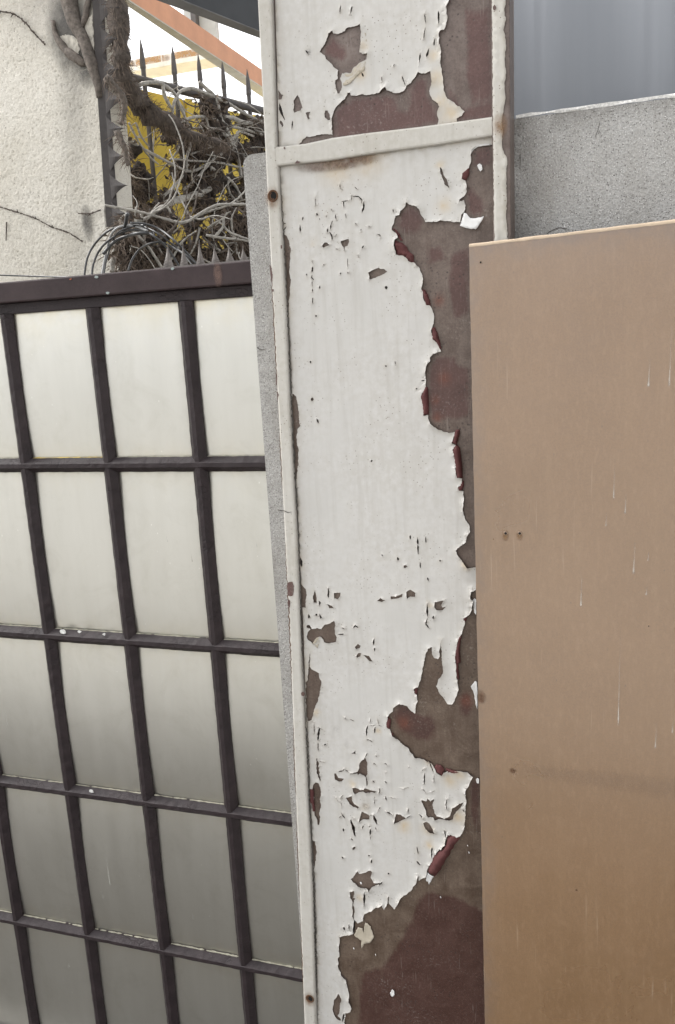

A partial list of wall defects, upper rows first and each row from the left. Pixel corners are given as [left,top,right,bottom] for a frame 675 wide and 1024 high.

peeling [300,0,496,144]
peeling [369,268,387,279]
peeling [392,143,493,568]
peeling [307,621,337,648]
peeling [301,660,321,824]
peeling [333,590,485,1024]